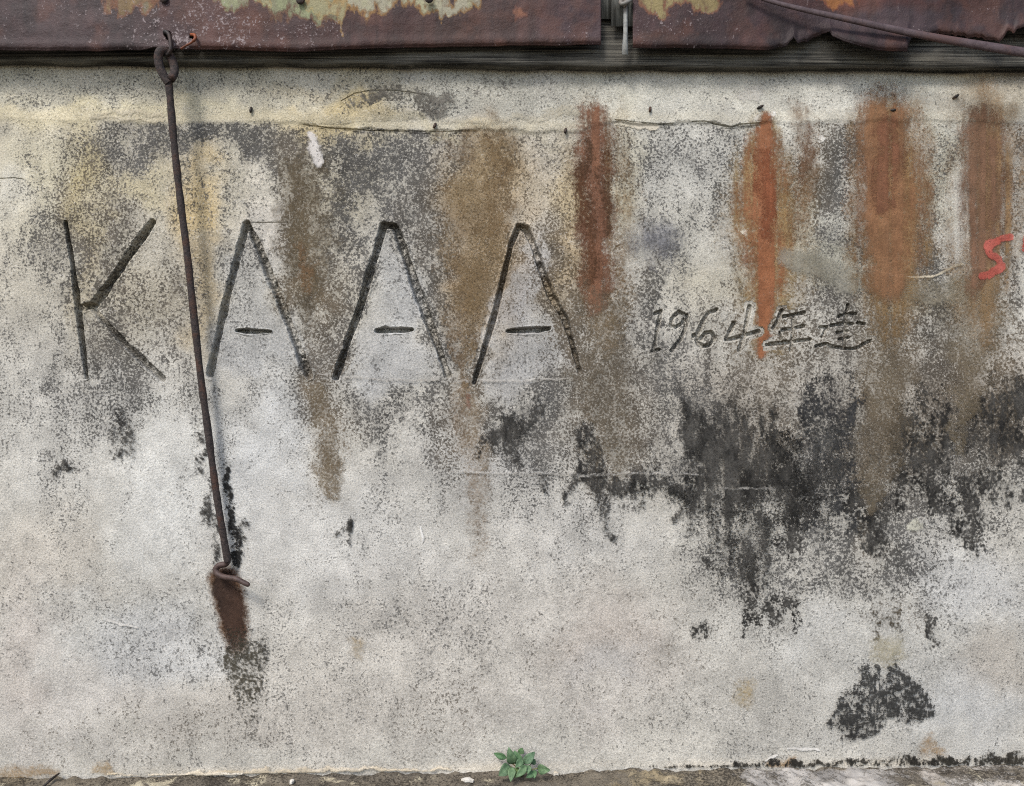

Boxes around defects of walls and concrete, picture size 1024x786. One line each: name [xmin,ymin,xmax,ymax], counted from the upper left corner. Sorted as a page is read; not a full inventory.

rust [575,105,630,315]
rust [732,111,817,359]
rust [852,93,933,334]
rust [960,80,1024,338]
mould [562,367,1024,648]
rust [208,567,269,727]
mould [826,659,936,742]